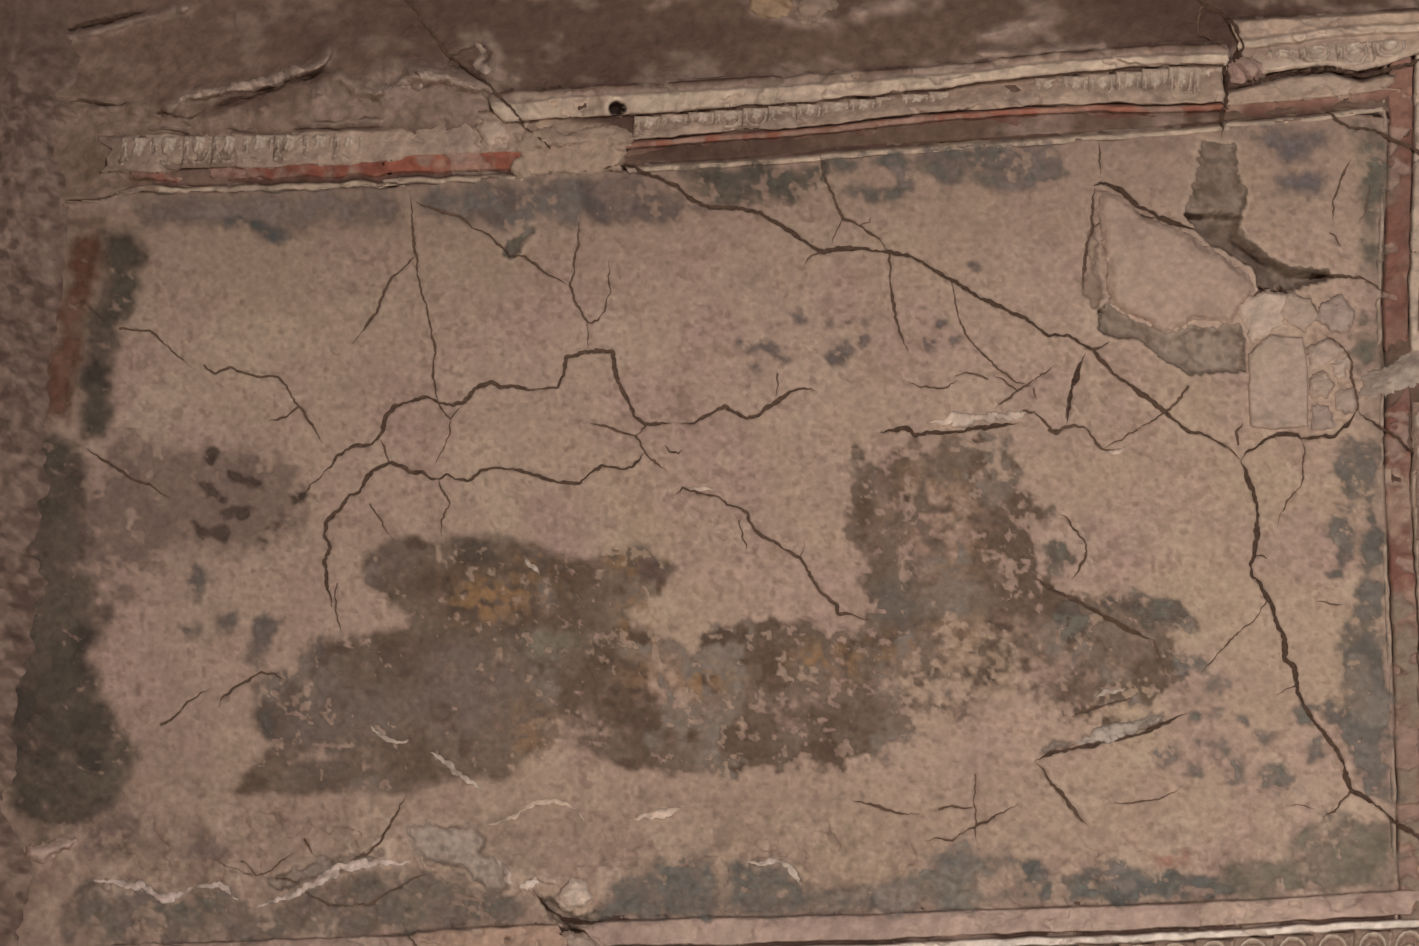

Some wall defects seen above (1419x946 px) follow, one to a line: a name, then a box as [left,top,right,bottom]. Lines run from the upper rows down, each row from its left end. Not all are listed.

flaking render [369,42,492,96]
crack [404,0,551,149]
crack [1196,0,1419,135]
flaking render [1082,141,1334,376]
water stain [10,235,306,847]
crack [74,195,869,636]
crack [583,107,1419,849]
water stain [1045,541,1076,575]
water stain [1102,593,1188,629]
crack [160,671,284,725]
crack [371,726,483,791]
crack [533,890,604,925]